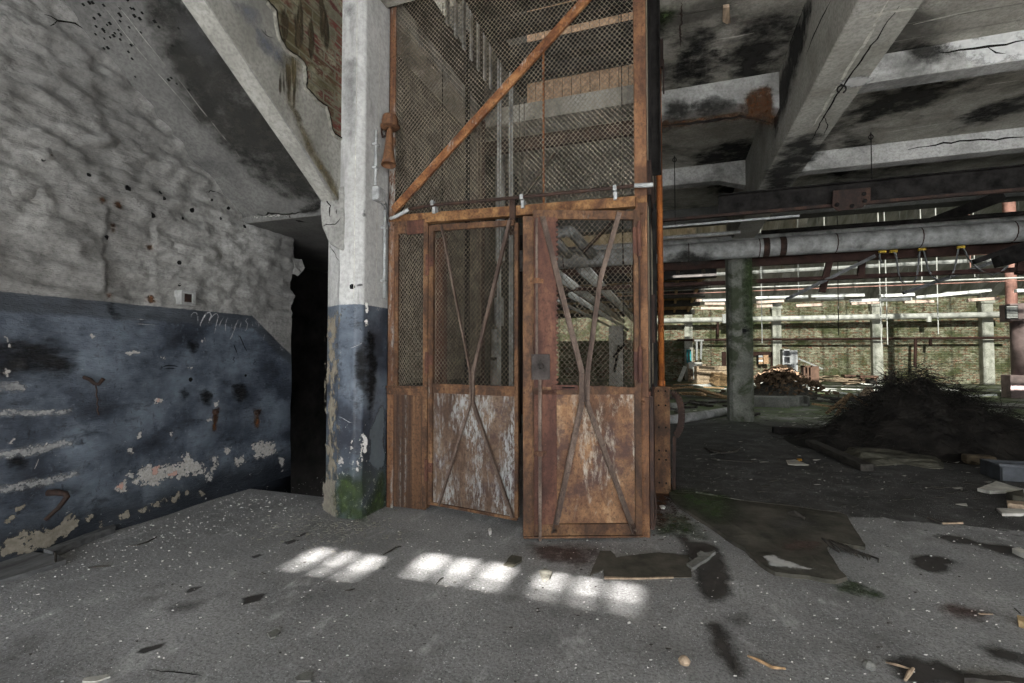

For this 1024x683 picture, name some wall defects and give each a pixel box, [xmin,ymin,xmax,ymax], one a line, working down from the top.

flaking render [266,0,343,141]
water stain [664,2,825,189]
corrosion [741,84,775,119]
crack [812,0,919,134]
water stain [841,77,969,126]
crack [908,137,1022,150]
crack [940,40,1024,54]
water stain [960,94,1024,124]
water stain [354,331,378,410]
peeling [321,311,368,517]
flaking render [0,513,103,557]
peeling [114,440,308,577]